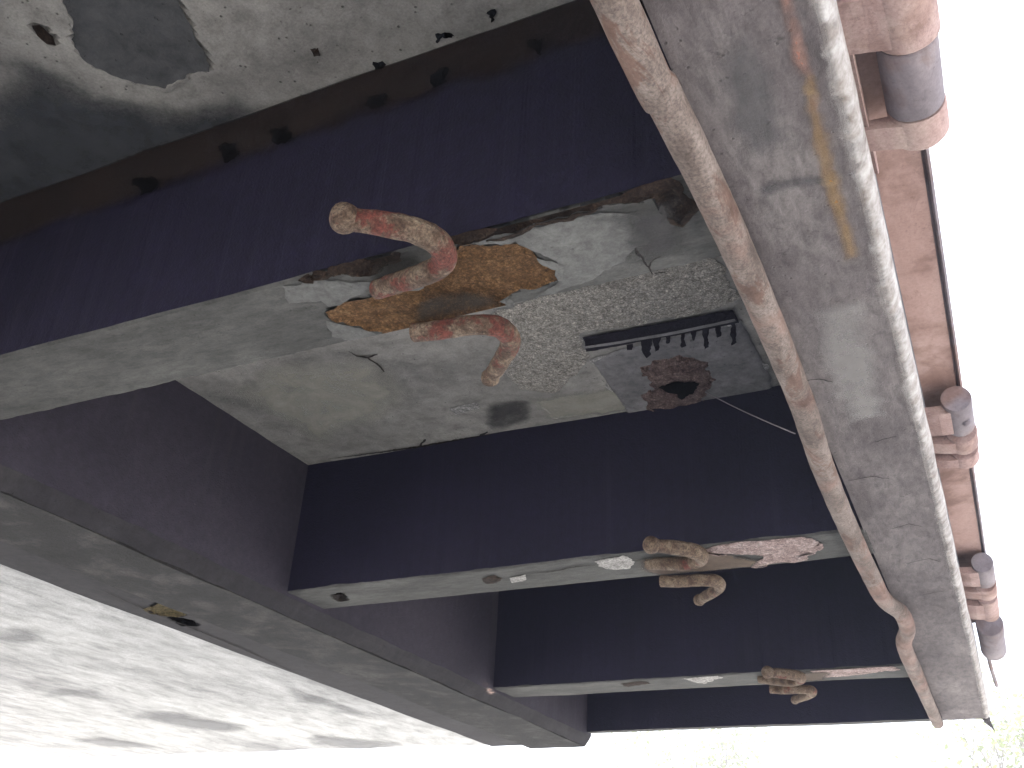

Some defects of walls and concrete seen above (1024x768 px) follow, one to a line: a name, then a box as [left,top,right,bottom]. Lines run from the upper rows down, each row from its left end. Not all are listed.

hole [32,25,56,46]
peeling [282,251,401,307]
corrosion [326,244,564,334]
peeling [450,178,740,394]
peeling [326,321,379,341]
crack [350,352,384,372]
spalling [640,355,716,411]
leakage [489,402,527,427]
peeling [706,537,824,568]
hole [483,575,502,584]
spalling [143,604,197,627]
peeling [811,666,900,678]